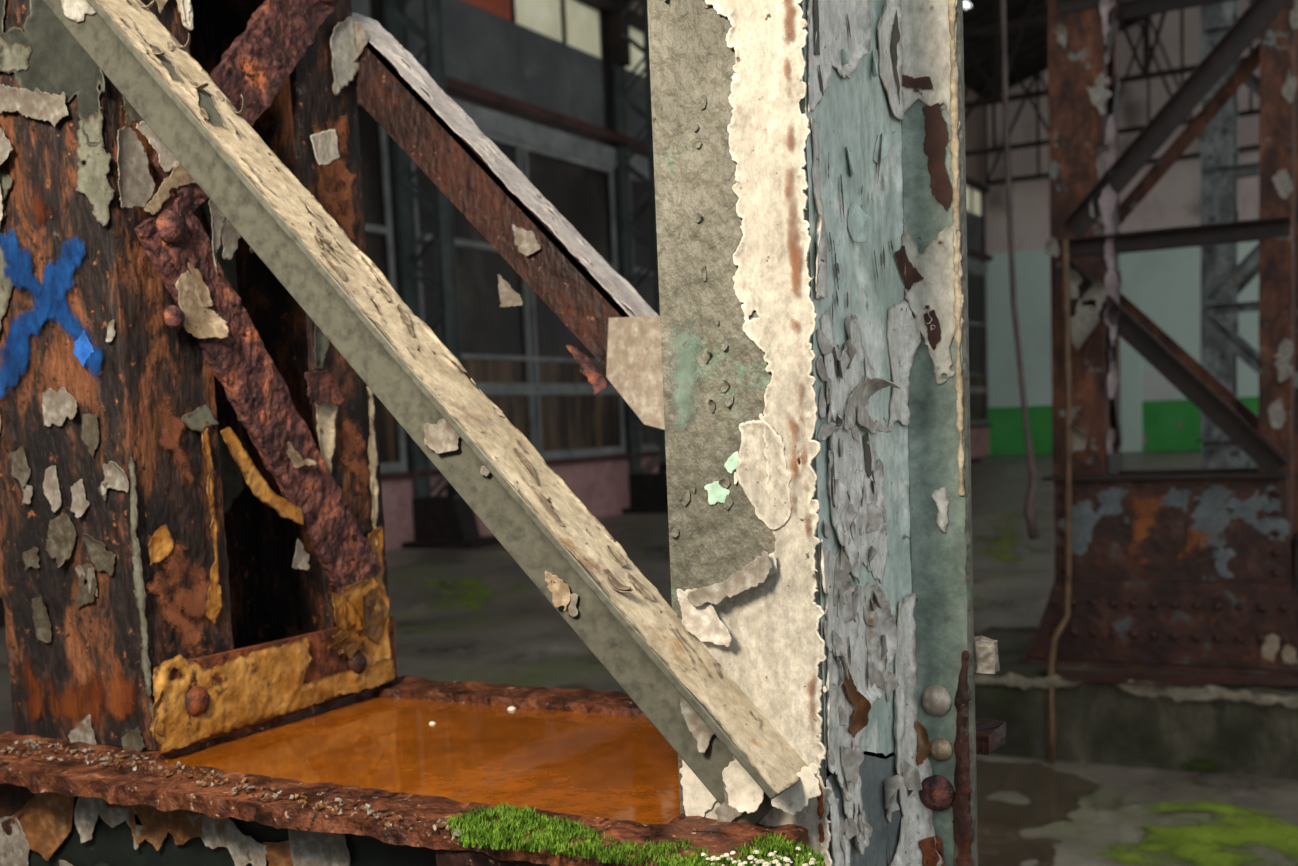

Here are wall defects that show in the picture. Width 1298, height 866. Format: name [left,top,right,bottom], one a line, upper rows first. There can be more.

rust [784,0,794,40]
rust [312,116,357,241]
rust [785,170,801,295]
rust [160,397,193,483]
rust [342,419,370,496]
peeling [0,0,965,866]
rust [790,417,806,479]
peeling [1058,483,1128,556]
peeling [1160,484,1291,581]
rust [147,543,213,652]
rust [23,658,135,723]
rust [0,783,37,835]